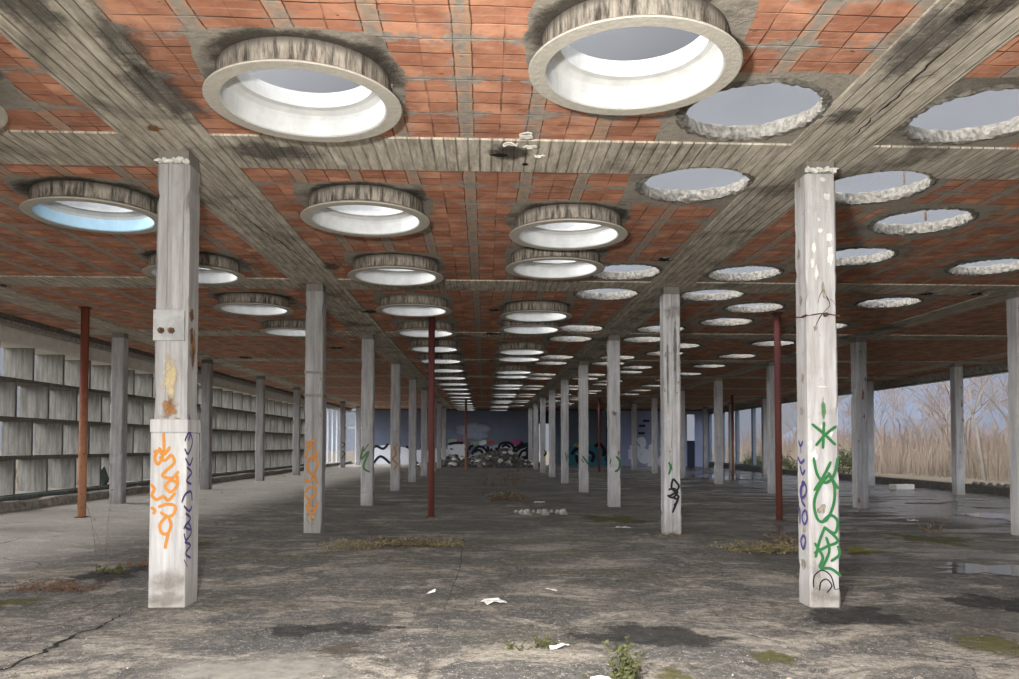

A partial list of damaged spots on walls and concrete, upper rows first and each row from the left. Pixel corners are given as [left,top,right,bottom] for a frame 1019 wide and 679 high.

leakage [0,0,64,30]
leakage [96,14,202,115]
leakage [889,0,1015,74]
crack [0,606,140,670]